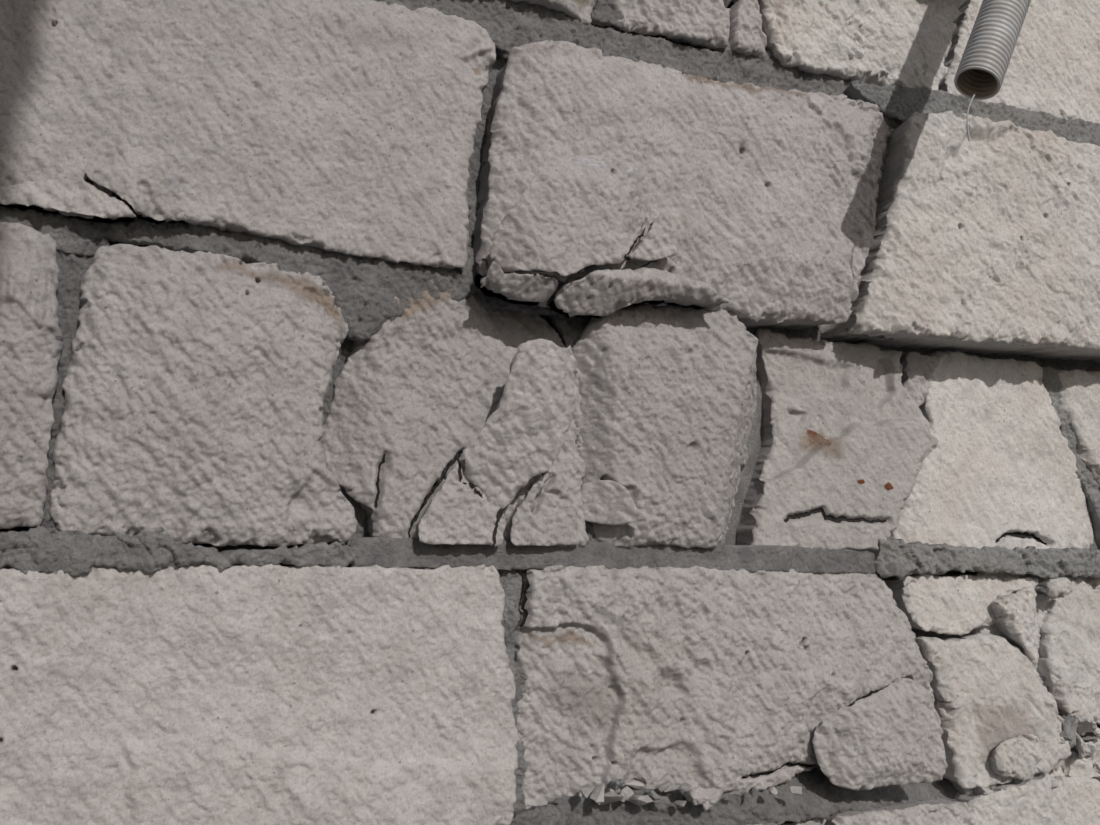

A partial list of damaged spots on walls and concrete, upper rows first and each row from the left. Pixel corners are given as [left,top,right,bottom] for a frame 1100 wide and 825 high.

crack [84,176,142,216]
crack [109,240,149,248]
crack [624,227,658,267]
crack [516,264,596,307]
rust [803,430,837,452]
crack [374,454,386,507]
crack [408,451,507,547]
crack [784,508,886,523]
crack [996,532,1047,545]
crack [519,569,530,627]
crack [742,762,816,778]